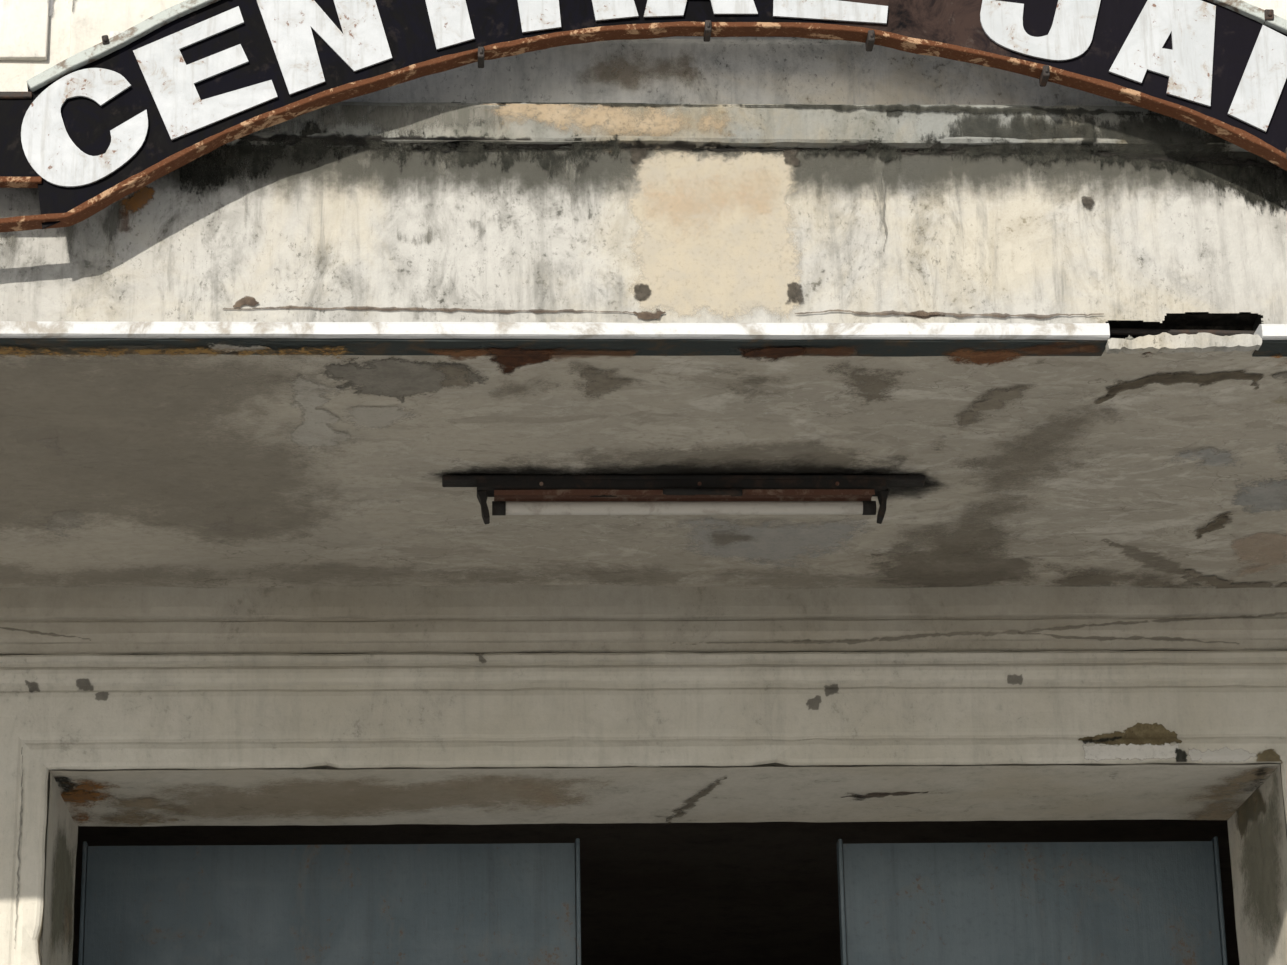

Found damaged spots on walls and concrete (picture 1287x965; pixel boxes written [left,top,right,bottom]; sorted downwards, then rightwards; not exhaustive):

rust [489,102,726,136]
rust [429,348,634,374]
rust [739,347,854,361]
rust [943,343,1100,366]
spalling [1105,313,1262,357]
peeling [286,357,485,449]
water stain [957,385,1033,427]
peeling [1095,371,1287,404]
water stain [872,410,1111,587]
water stain [1048,565,1187,588]
spalling [1079,723,1282,764]
crack [666,777,727,824]